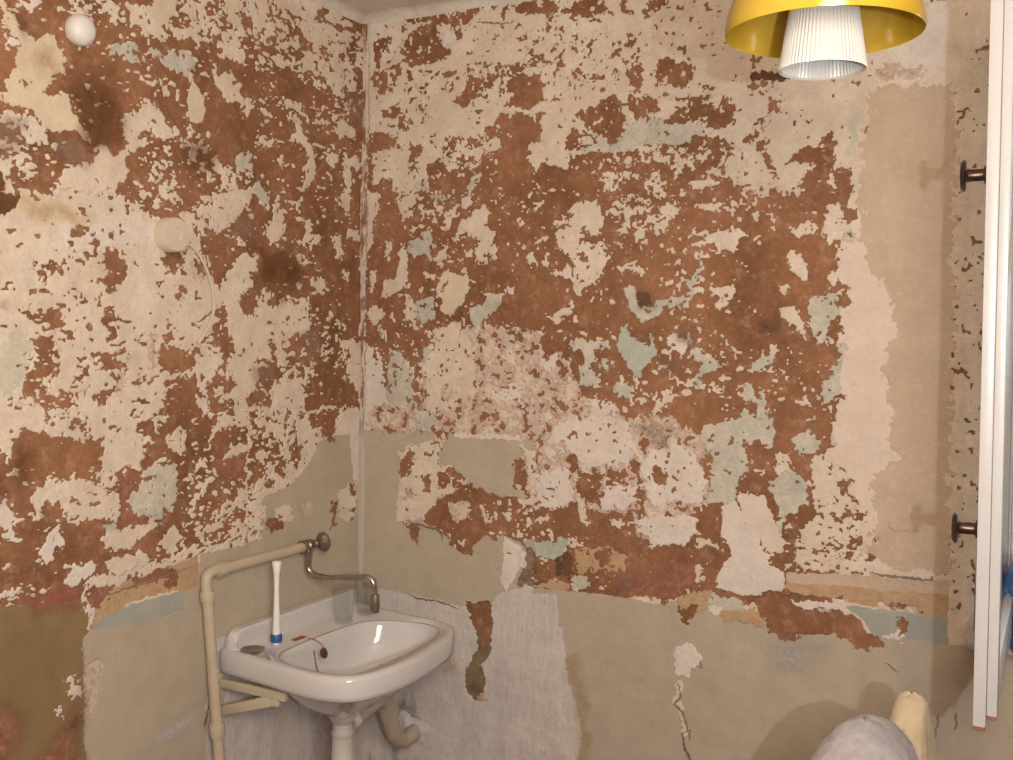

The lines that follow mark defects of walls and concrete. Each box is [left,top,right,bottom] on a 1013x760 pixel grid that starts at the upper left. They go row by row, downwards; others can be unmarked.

peeling [851,55,927,87]
flaking render [956,85,988,133]
flaking render [954,236,984,287]
flaking render [0,0,905,652]
flaking render [950,305,982,435]
flaking render [871,602,923,615]
spalling [465,600,493,701]
crack [674,683,692,760]
spalling [672,640,703,737]
crack [934,712,958,737]